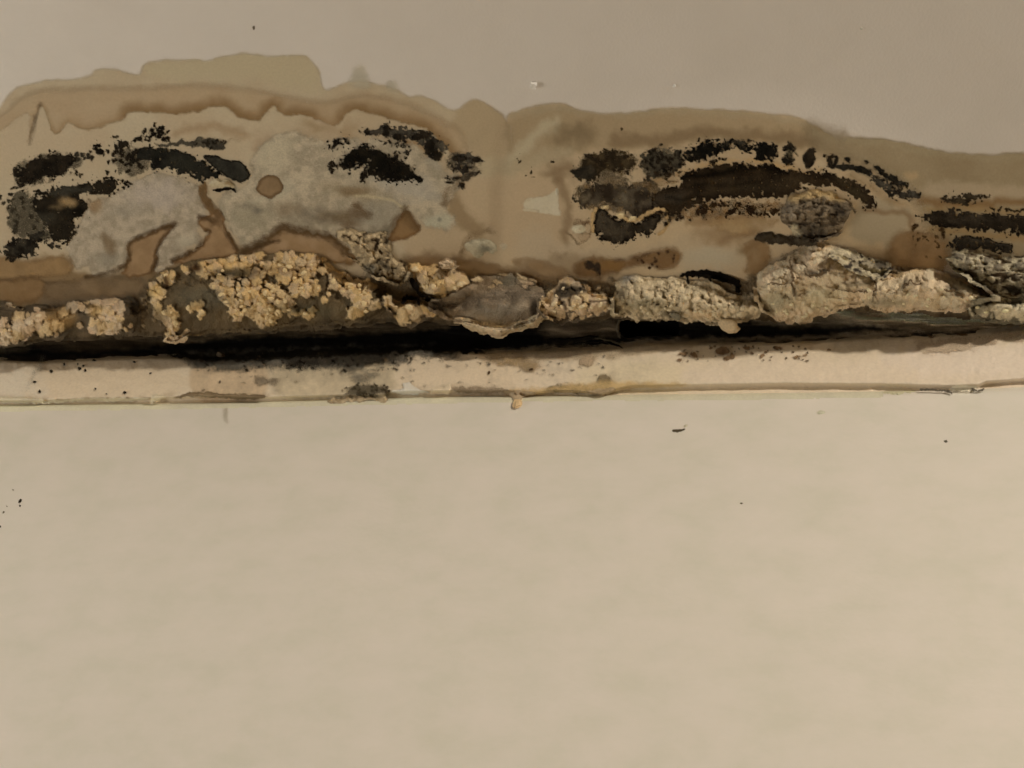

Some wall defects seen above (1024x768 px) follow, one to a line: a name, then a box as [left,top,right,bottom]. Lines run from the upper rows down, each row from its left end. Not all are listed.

damp [0,51,1024,309]
flaking render [0,228,495,349]
flaking render [515,241,1024,339]
damp [24,356,97,393]
damp [163,327,1024,398]